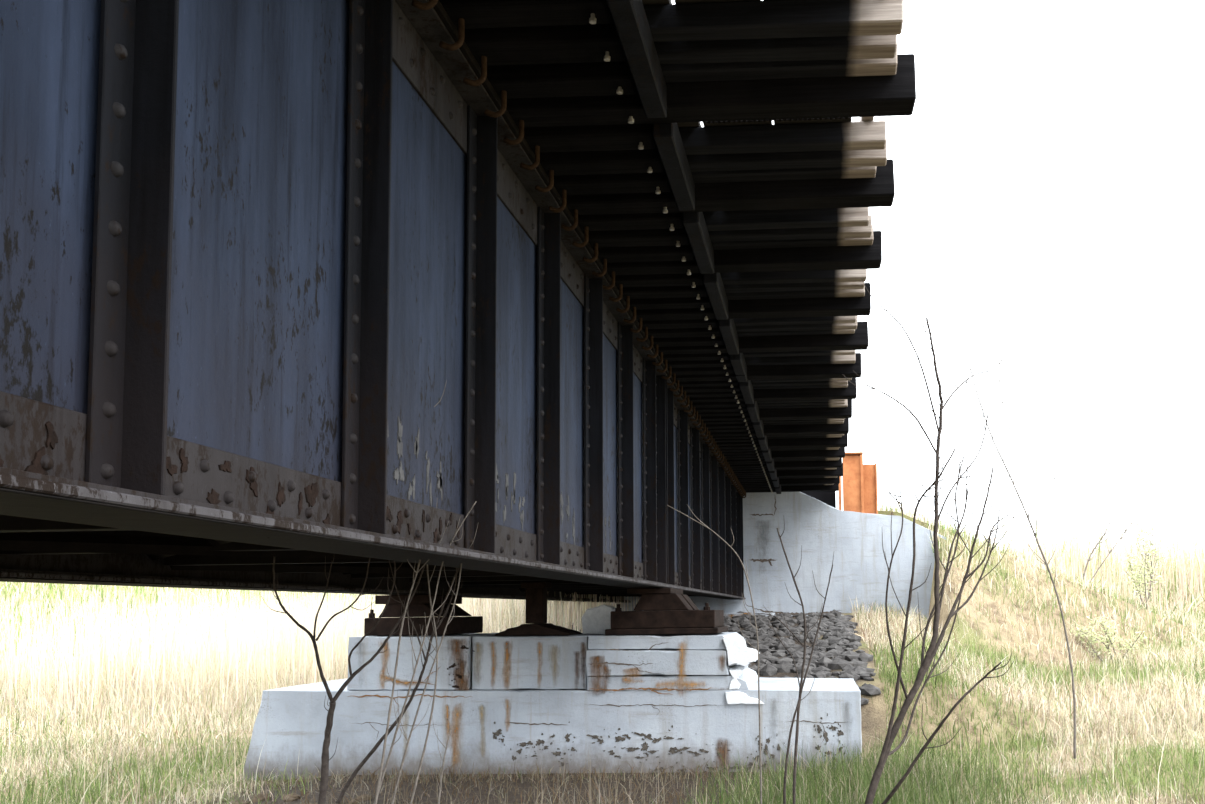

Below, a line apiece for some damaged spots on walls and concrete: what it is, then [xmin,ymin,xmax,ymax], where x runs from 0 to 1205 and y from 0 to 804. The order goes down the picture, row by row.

corrosion [24,421,58,475]
corrosion [166,448,189,476]
peeling [388,416,442,507]
corrosion [206,489,221,505]
corrosion [218,461,319,516]
corrosion [451,640,468,691]
corrosion [491,642,510,685]
corrosion [575,643,642,692]
corrosion [656,643,704,687]
spalling [723,636,764,704]
corrosion [446,706,460,762]
peeling [493,722,785,773]